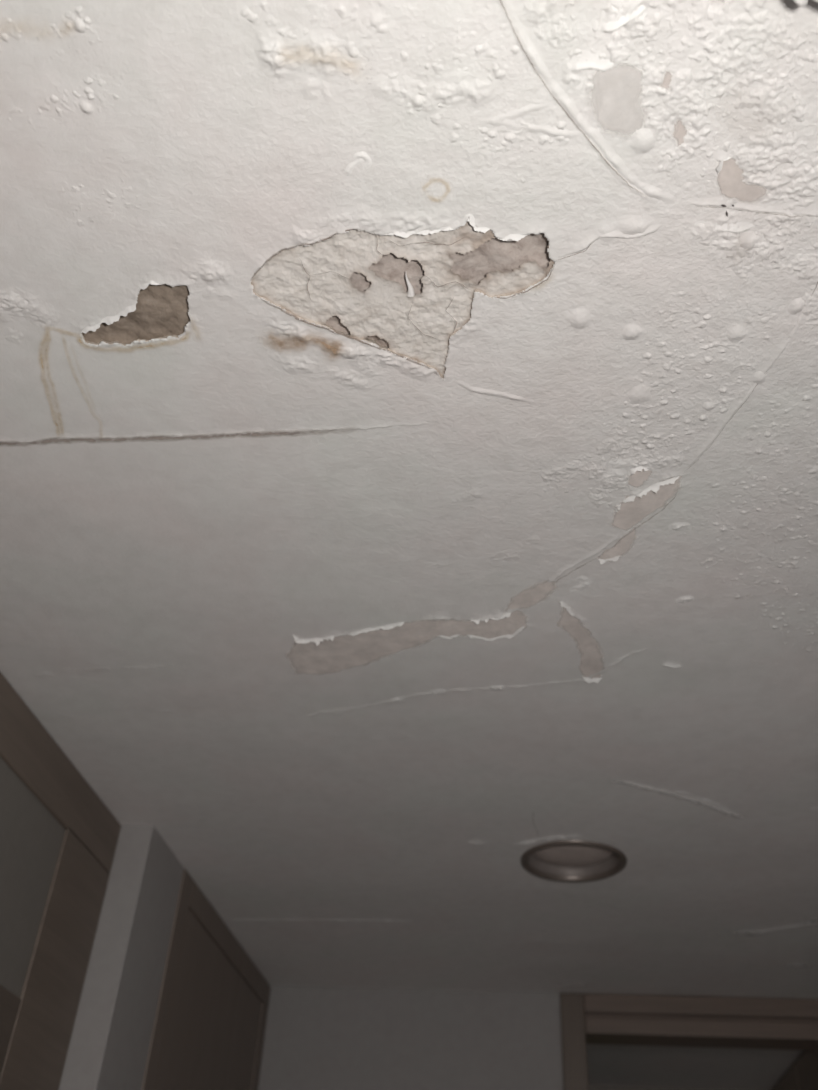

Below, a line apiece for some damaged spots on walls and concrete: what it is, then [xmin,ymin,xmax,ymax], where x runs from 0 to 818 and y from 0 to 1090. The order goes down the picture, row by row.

peeling [522,0,818,375]
peeling [70,270,202,354]
spalling [242,209,564,384]
crack [0,419,432,445]
peeling [593,458,689,564]
peeling [287,606,534,675]